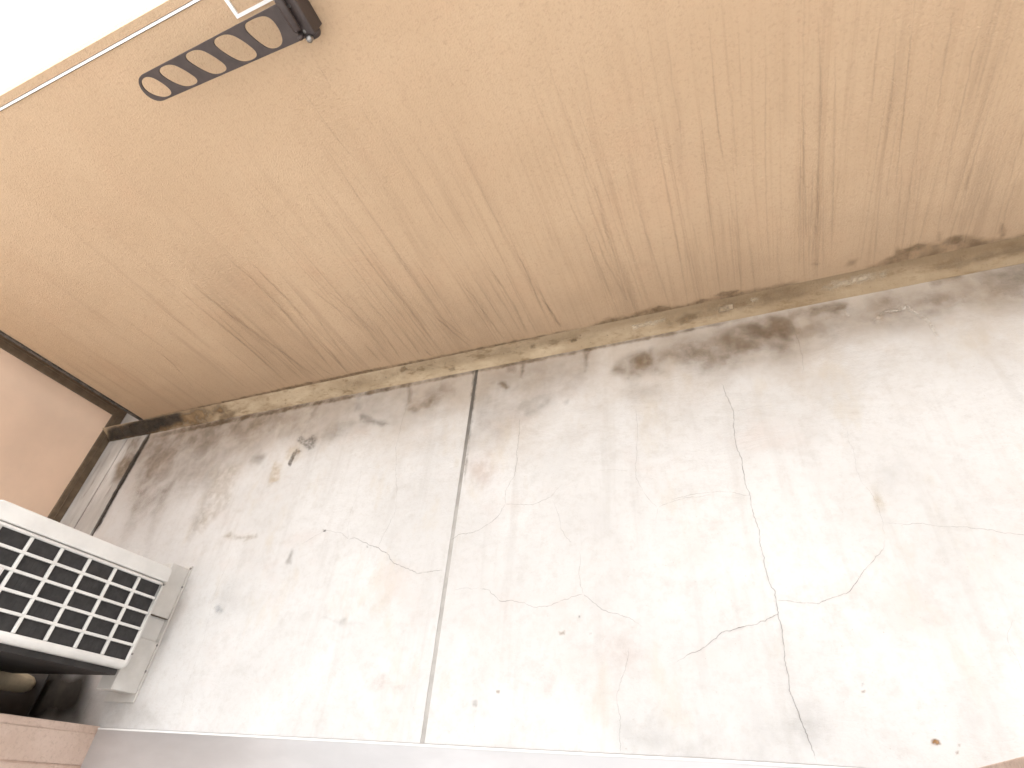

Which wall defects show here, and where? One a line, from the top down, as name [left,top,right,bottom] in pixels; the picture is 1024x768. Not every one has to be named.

water stain [95,439,148,528]